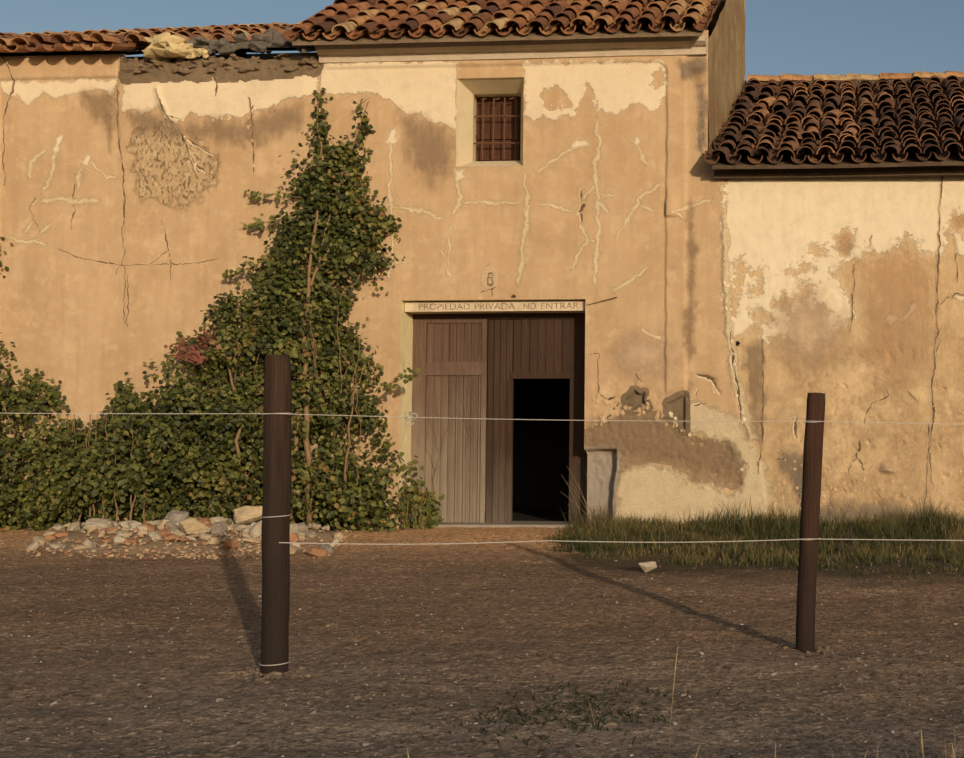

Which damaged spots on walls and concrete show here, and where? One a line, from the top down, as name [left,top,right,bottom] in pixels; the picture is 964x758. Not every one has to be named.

crack [1,56,218,327]
peeling [0,27,458,207]
peeling [521,58,669,121]
peeling [584,155,964,524]
crack [847,176,964,512]